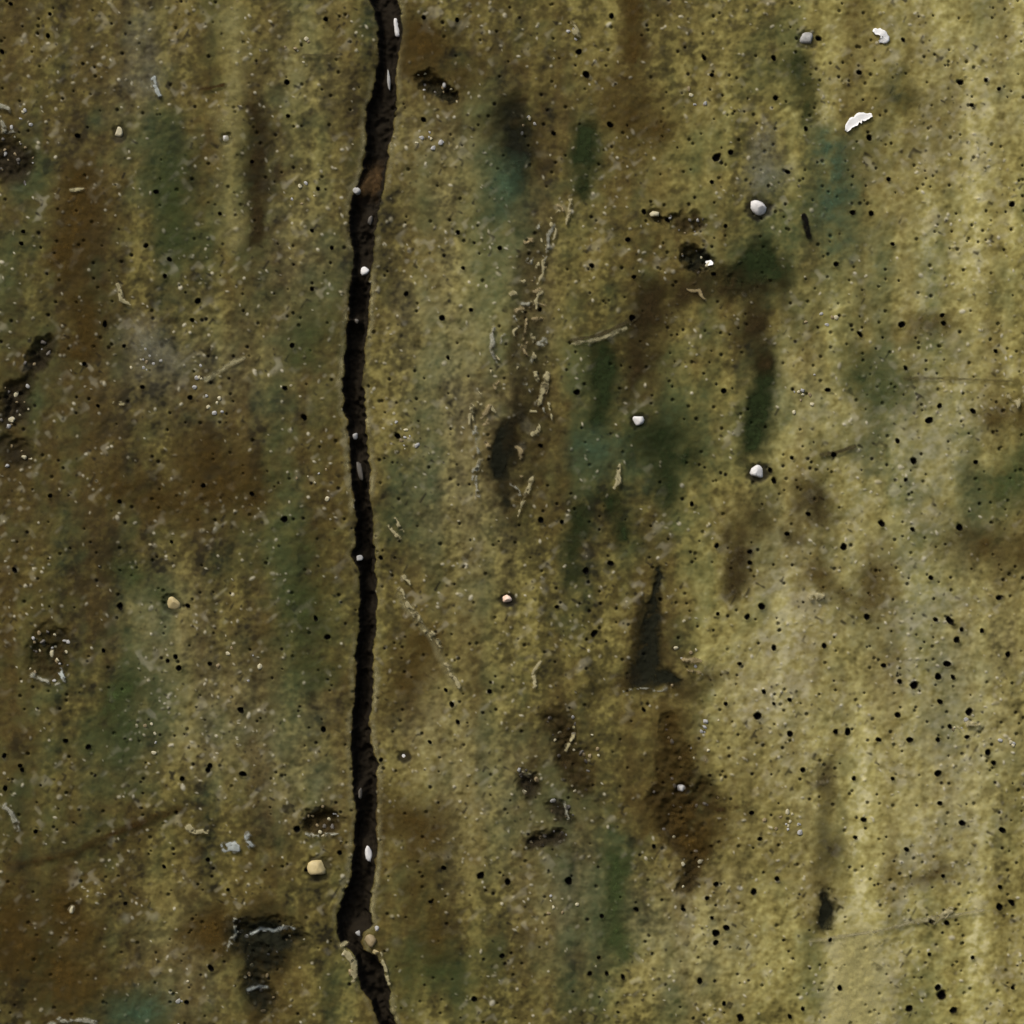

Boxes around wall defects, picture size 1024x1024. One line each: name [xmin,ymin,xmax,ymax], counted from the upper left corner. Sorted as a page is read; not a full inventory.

leakage [501,99,533,192]
crack [336,0,403,1024]
leakage [488,391,525,508]
leakage [626,566,681,691]